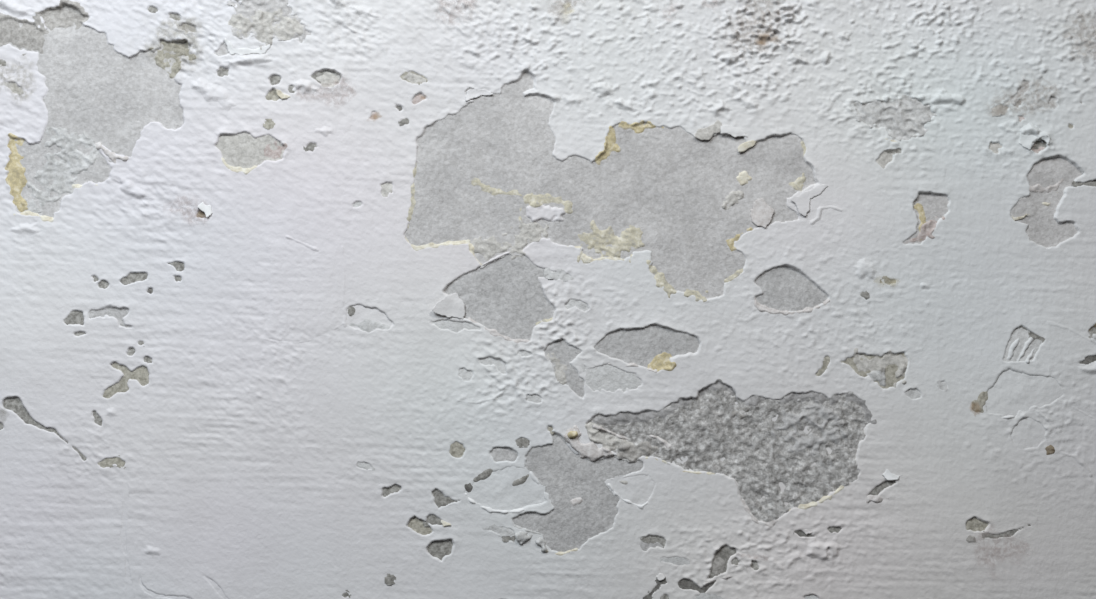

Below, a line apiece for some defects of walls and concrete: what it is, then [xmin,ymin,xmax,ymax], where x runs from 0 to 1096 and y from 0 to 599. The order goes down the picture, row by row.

peeling [0,0,197,222]
peeling [396,71,428,125]
peeling [216,119,288,174]
peeling [991,81,1083,248]
peeling [405,72,830,356]
peeling [93,273,153,294]
peeling [64,308,131,336]
peeling [103,341,152,398]
peeling [545,339,585,398]
peeling [594,325,700,373]
peeling [816,348,921,399]
peeling [408,379,877,561]